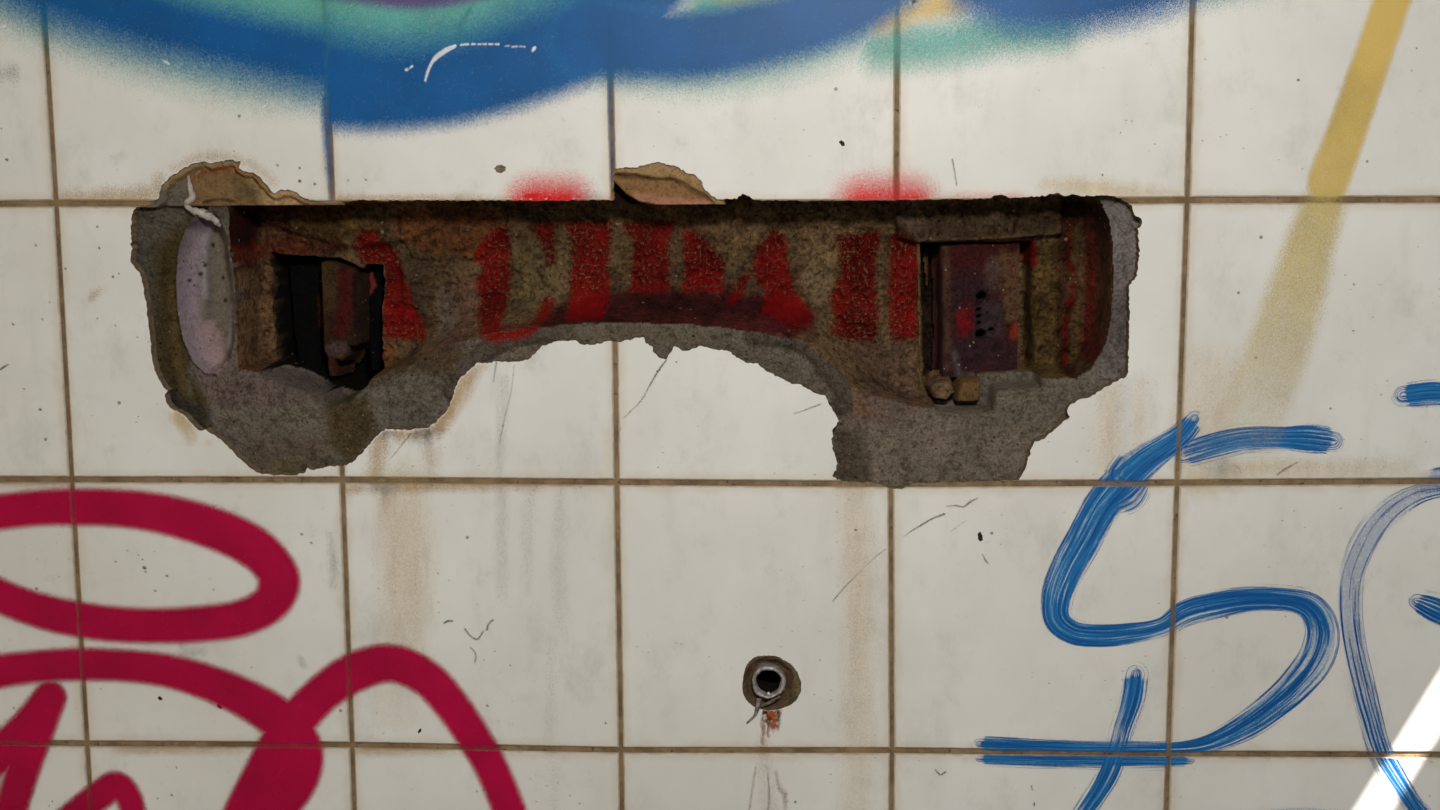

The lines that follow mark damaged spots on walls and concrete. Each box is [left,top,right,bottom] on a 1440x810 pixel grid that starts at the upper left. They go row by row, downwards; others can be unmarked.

spalling [136,150,1139,488]
rust [748,710,789,810]